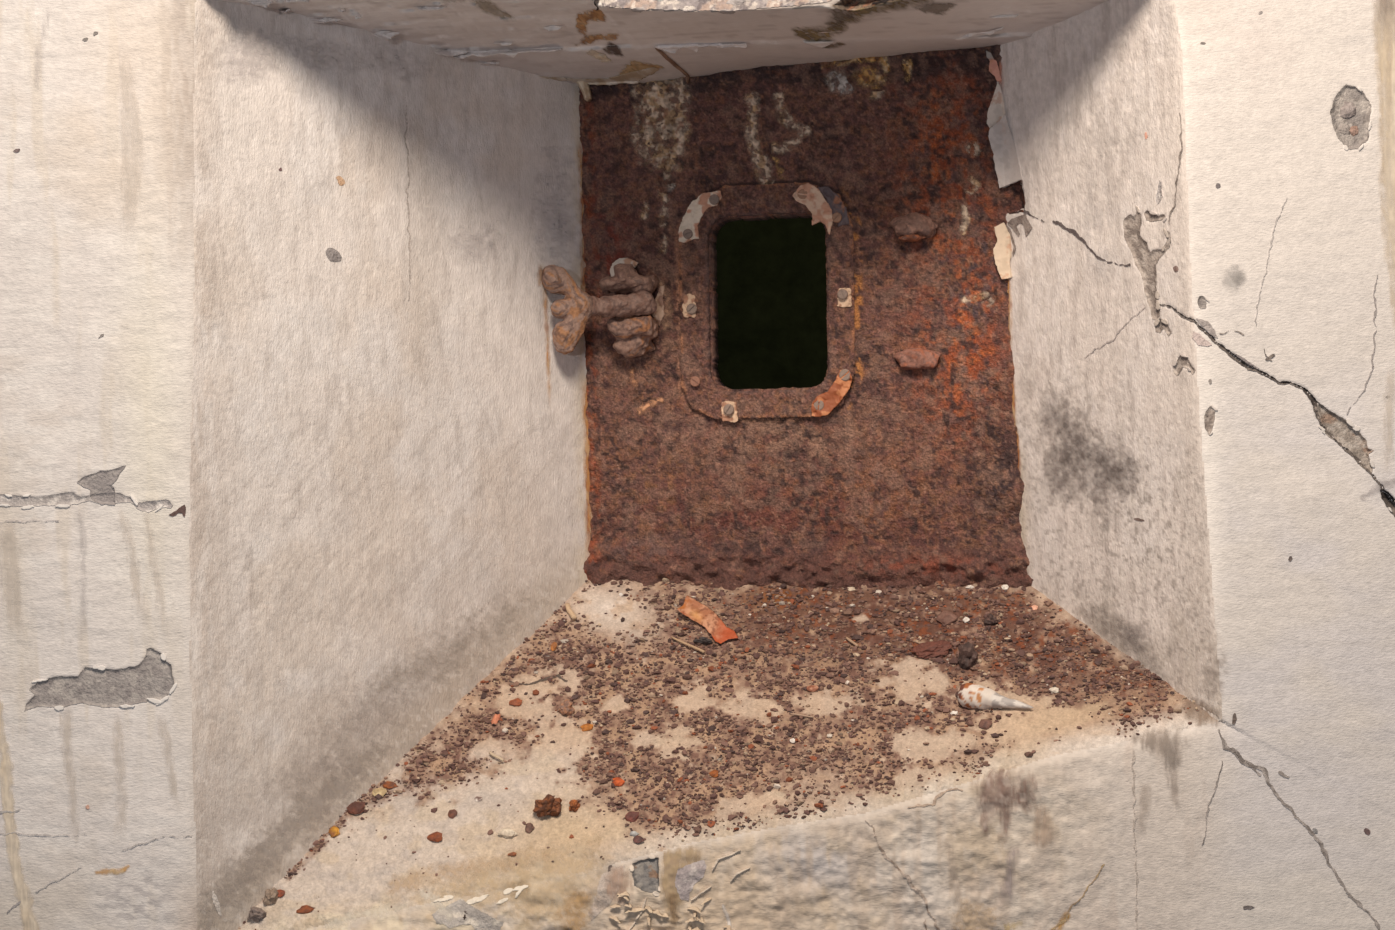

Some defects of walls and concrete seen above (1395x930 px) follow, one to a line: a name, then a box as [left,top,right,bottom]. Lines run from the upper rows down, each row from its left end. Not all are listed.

spalling [602,0,896,14]
spalling [1330,84,1372,151]
damp [1375,0,1395,307]
crack [1023,210,1130,266]
spalling [1123,180,1178,336]
crack [1085,198,1395,517]
spalling [0,465,186,517]
damp [1053,426,1134,502]
spalling [24,648,178,711]
damp [0,703,39,930]
crack [1202,729,1380,930]